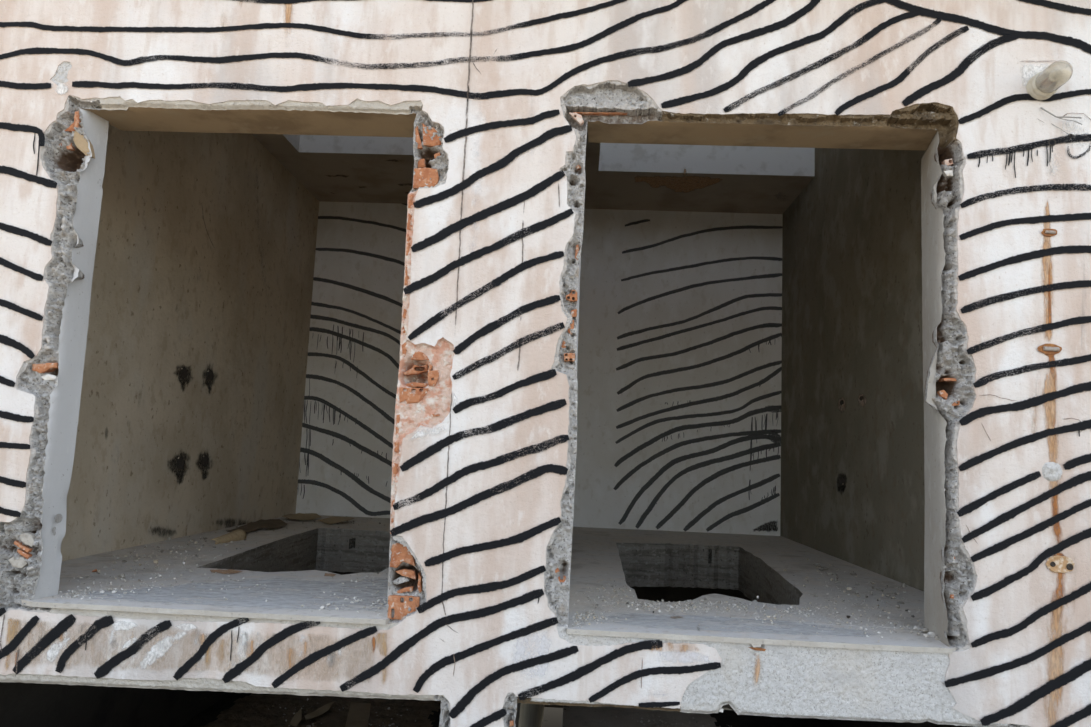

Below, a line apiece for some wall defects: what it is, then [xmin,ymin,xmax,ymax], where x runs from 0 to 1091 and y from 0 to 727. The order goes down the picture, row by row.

corrosion [1042,202,1053,340]
flaking render [0,62,455,727]
flaking render [502,81,1031,727]
corrosion [1044,354,1058,463]
crack [442,394,456,676]
corrosion [1050,480,1064,556]
corrosion [1048,573,1063,727]